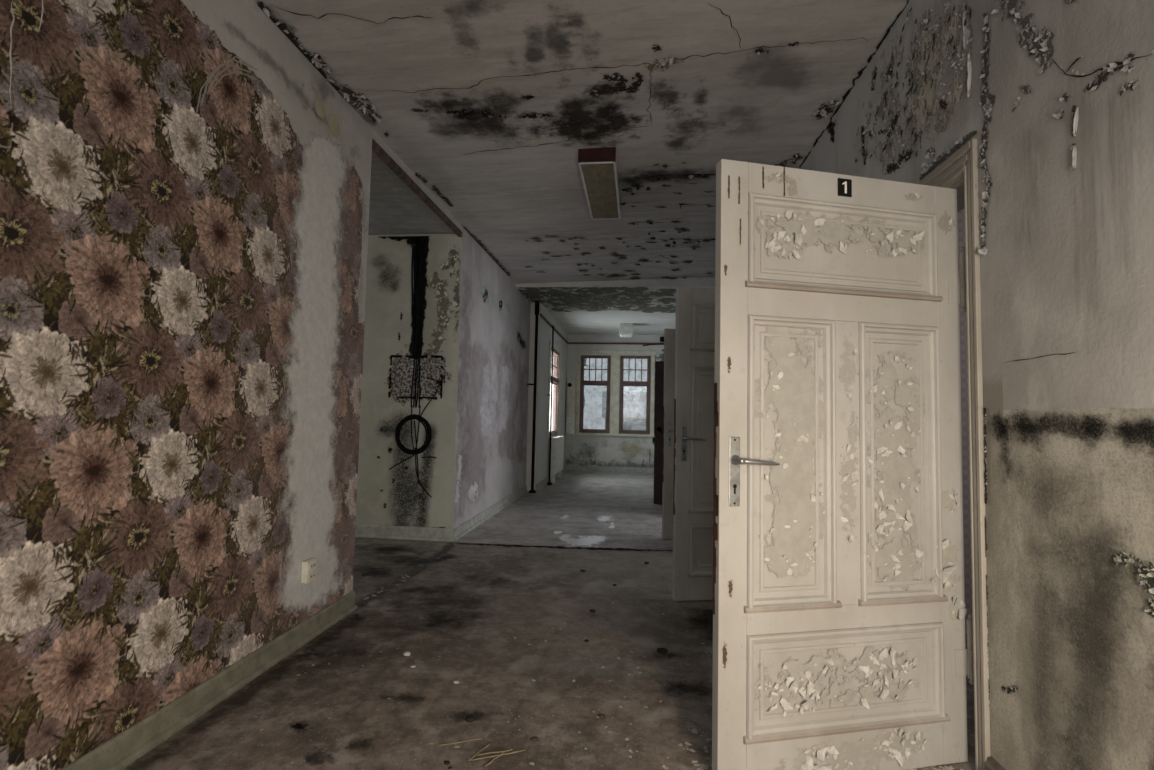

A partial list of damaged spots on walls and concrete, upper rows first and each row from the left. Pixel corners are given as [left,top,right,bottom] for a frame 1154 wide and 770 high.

crack [276,7,433,24]
mould [434,95,518,136]
leakage [534,84,638,146]
crack [358,0,909,167]
spalling [855,0,1054,255]
spalling [518,220,716,313]
flaking render [278,135,361,612]
spalling [385,245,461,406]
leakage [407,428,435,527]
peeling [842,401,924,582]
leakage [992,413,1154,473]
peeling [758,648,917,717]